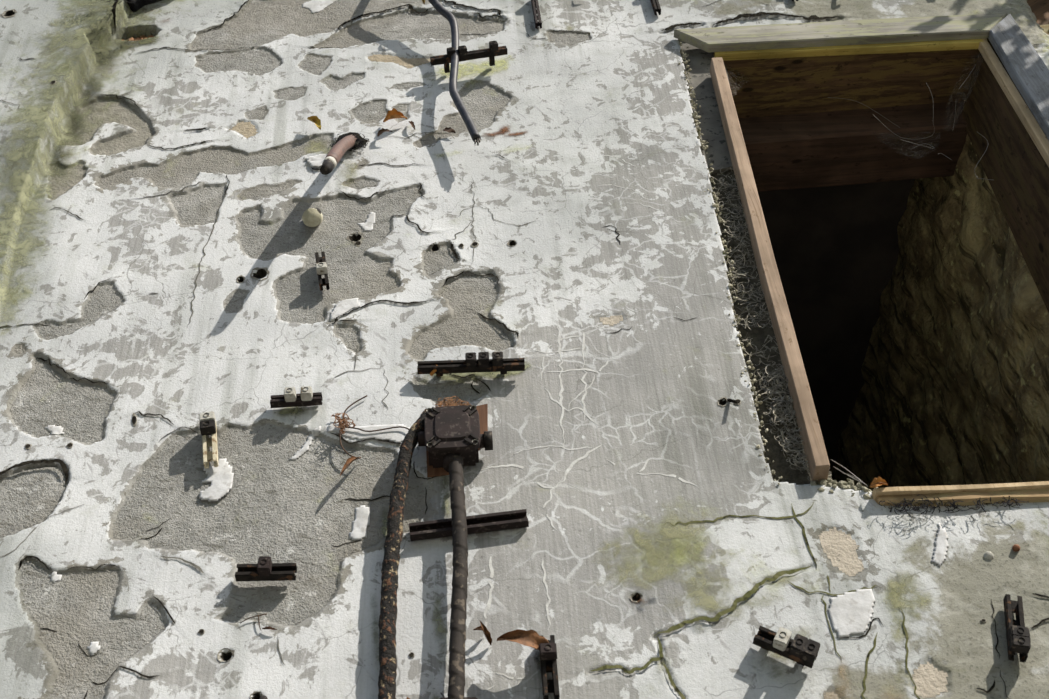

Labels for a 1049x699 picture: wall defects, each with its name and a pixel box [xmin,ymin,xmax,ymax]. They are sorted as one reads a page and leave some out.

flaking render [192,0,504,90]
crack [661,0,839,31]
water stain [0,0,158,321]
flaking render [64,99,153,156]
flaking render [97,136,333,226]
flaking render [238,162,423,353]
flaking render [408,245,513,360]
flaking render [10,345,114,444]
flaking render [0,464,65,537]
flaking render [112,422,410,625]
flaking render [20,561,166,699]
crack [591,500,920,699]